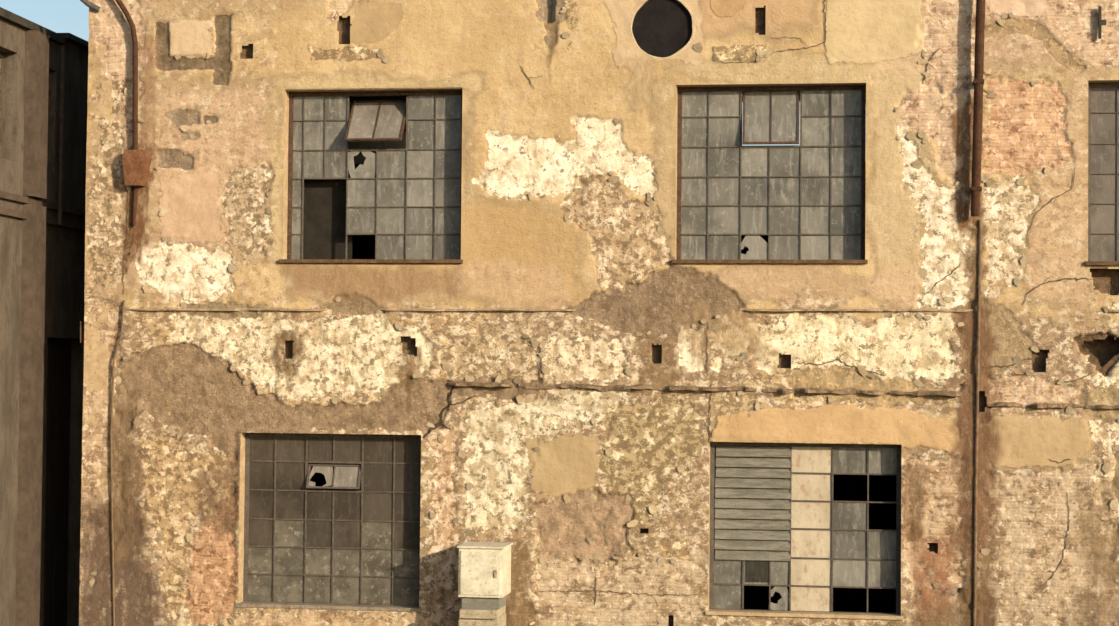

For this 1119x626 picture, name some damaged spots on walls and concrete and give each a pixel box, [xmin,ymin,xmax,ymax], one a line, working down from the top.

rust [122,172,153,262]
spalling [80,0,769,626]
flaking render [471,0,1119,626]
leakage [903,463,925,540]
leakage [928,225,994,626]
crack [1027,169,1075,241]